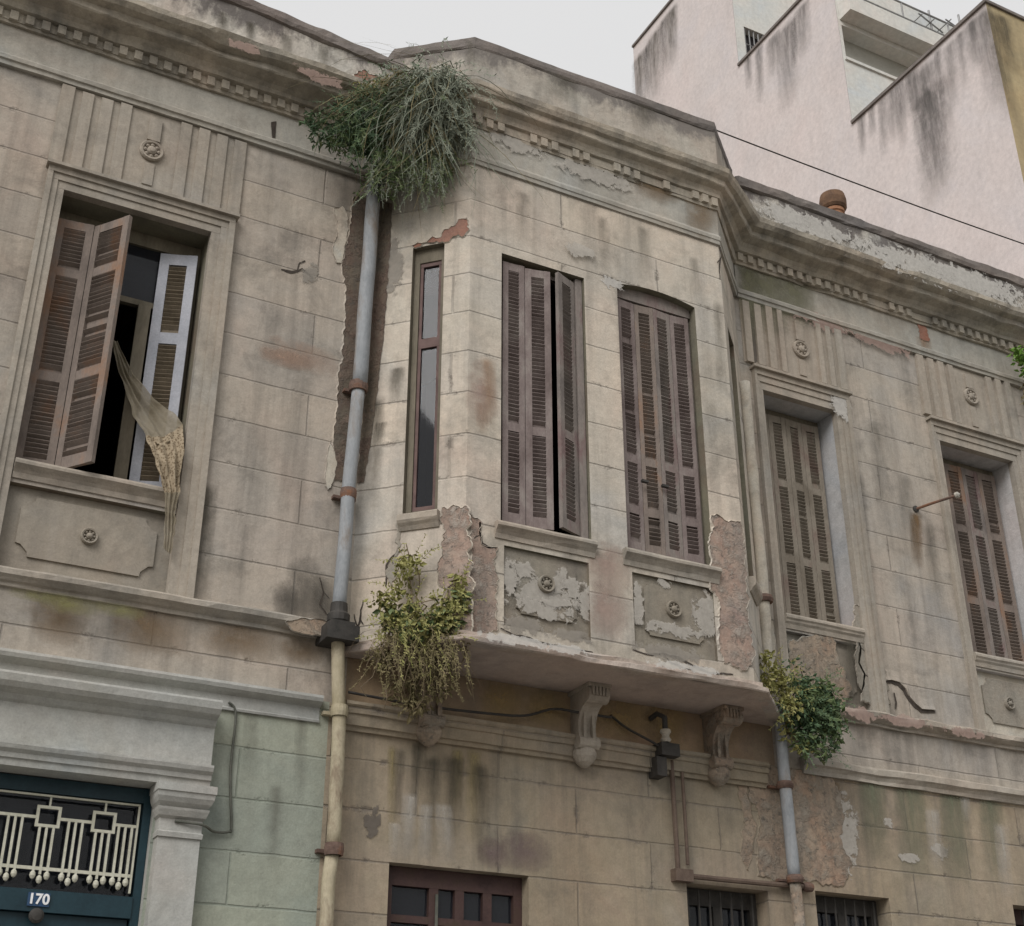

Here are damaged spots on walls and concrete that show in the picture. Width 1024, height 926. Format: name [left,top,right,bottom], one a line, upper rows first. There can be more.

peeling [229,38,260,54]
peeling [297,68,388,96]
peeling [331,205,349,264]
spalling [386,217,470,295]
peeling [750,199,1024,310]
peeling [436,504,592,644]
spalling [633,514,756,672]
spalling [285,618,327,637]
crack [859,647,936,713]
spalling [364,806,381,838]
spalling [747,765,859,888]